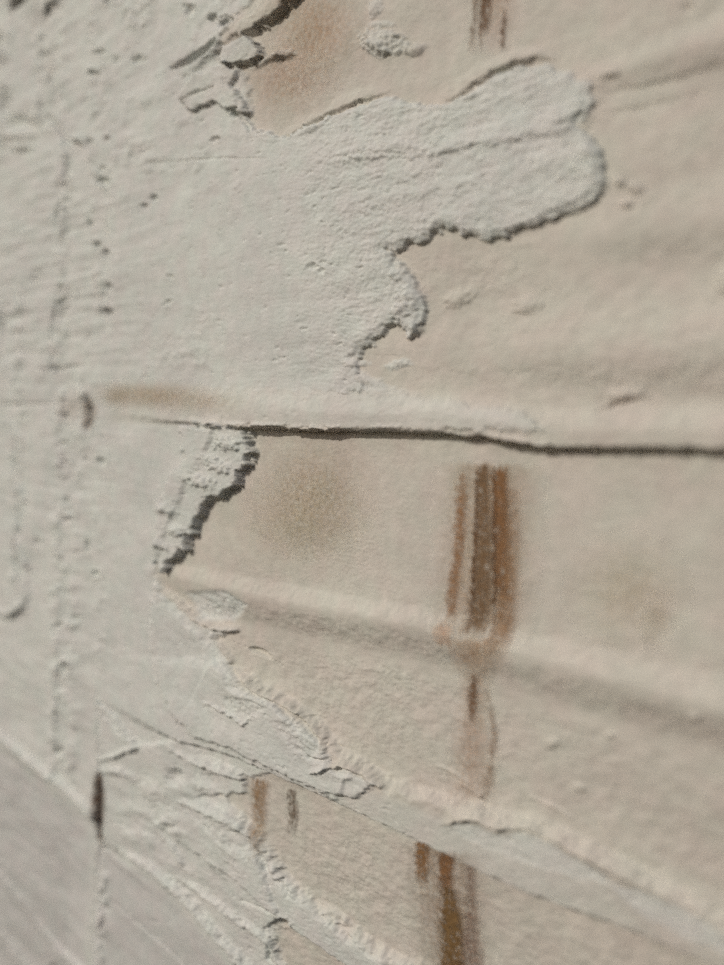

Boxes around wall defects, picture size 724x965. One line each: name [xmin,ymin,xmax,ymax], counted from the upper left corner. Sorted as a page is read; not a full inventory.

hole [179,0,197,19]
rust [479,0,490,28]
flaking render [93,12,613,398]
rust [448,465,513,661]
flaking render [92,419,385,965]
rust [417,842,476,965]
flaking render [441,806,724,954]